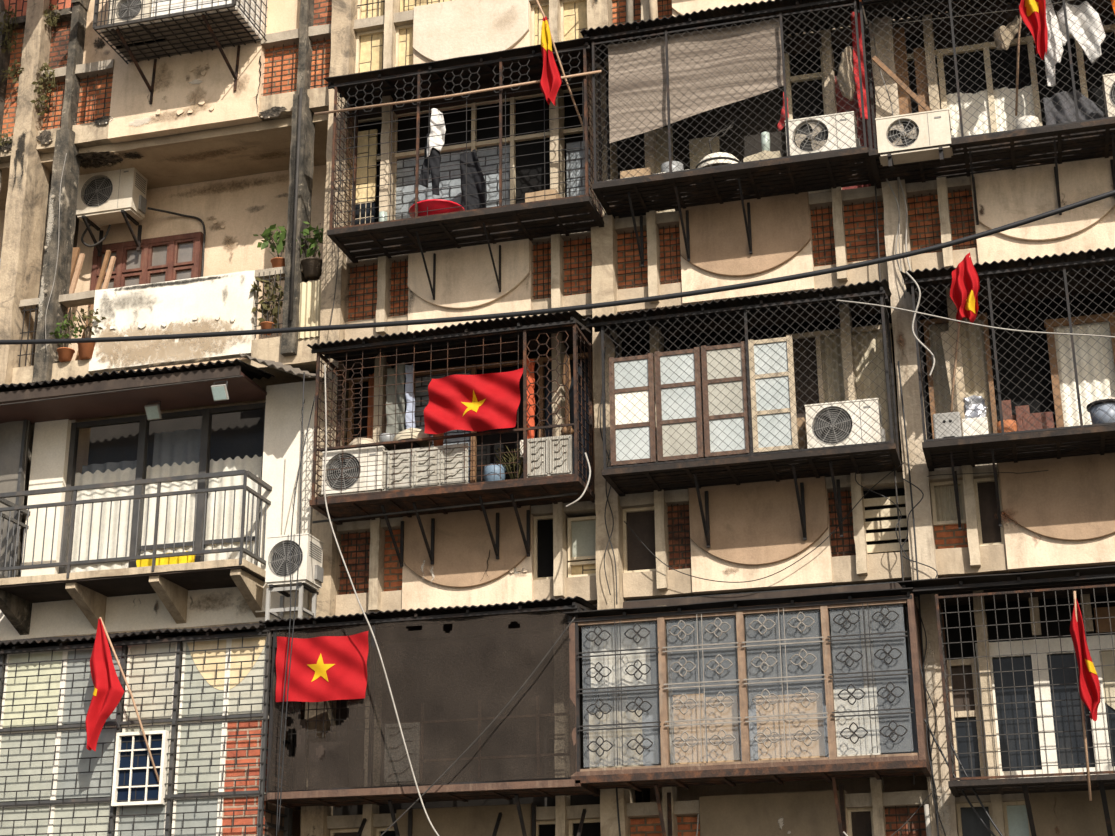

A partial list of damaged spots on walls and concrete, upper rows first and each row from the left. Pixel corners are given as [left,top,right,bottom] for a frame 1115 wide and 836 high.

damp [261,146,296,279]
peeling [95,315,245,367]